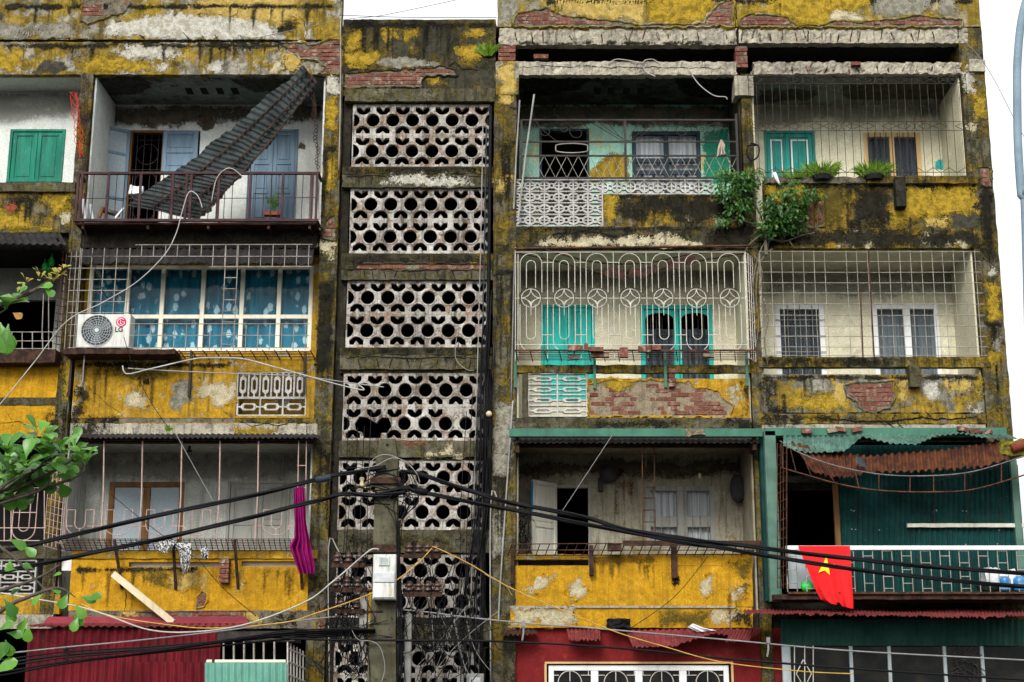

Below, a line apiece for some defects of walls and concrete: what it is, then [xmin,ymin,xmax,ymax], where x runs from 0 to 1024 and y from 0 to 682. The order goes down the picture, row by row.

water stain [345,19,493,58]
flaking render [498,0,964,43]
peeling [0,0,590,143]
water stain [519,178,997,262]
water stain [45,360,232,437]
peeling [119,378,279,435]
flaking render [586,376,735,420]
flaking render [770,376,908,414]
corrosion [791,439,1009,479]
peeling [508,573,589,629]